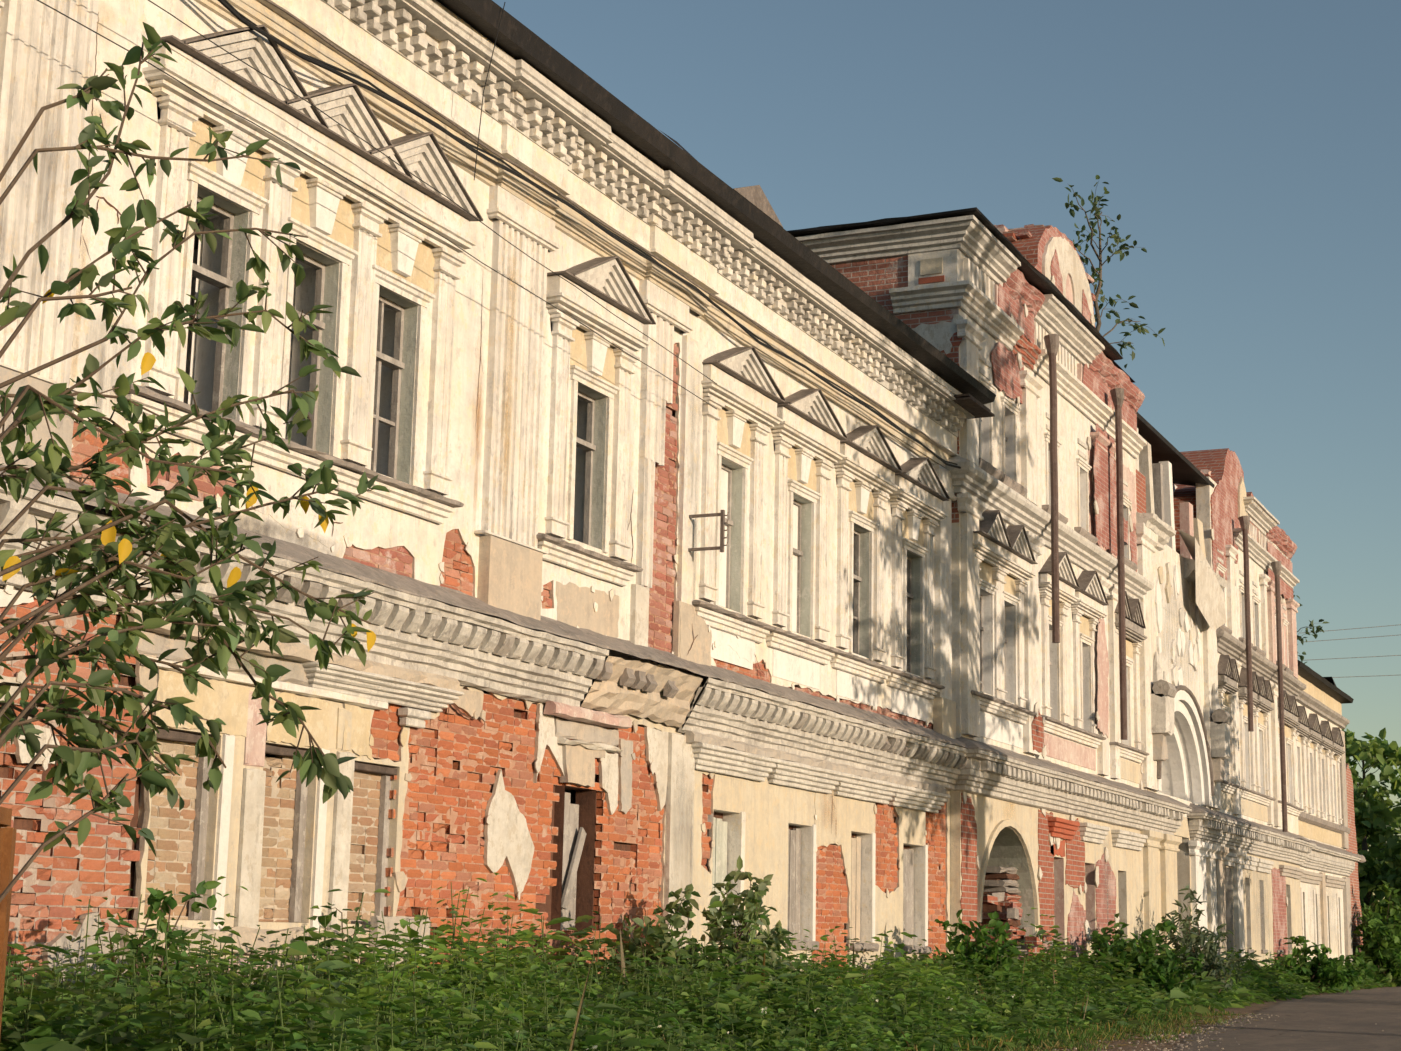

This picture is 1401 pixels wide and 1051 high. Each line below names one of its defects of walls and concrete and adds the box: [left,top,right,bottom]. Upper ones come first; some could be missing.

flaking render [70,422,129,495]
peeling [145,453,413,595]
flaking render [438,529,474,611]
flaking render [644,343,933,738]
flaking render [991,283,1035,406]
flaking render [1082,364,1137,432]
flaking render [1087,423,1138,572]
spalling [0,585,157,1001]
spalling [367,688,668,974]
spalling [873,802,902,898]
spalling [924,791,981,965]
flaking render [1037,808,1120,968]